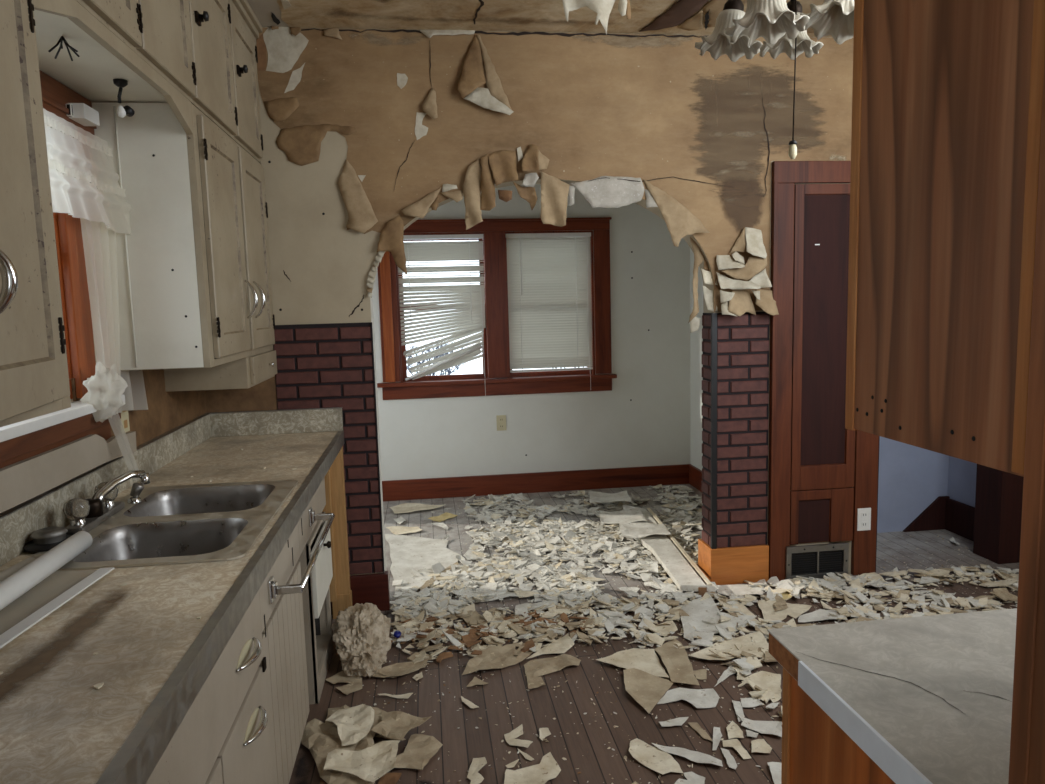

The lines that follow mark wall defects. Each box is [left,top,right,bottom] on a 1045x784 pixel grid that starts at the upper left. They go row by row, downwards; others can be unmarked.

crack [473,0,707,38]
peeling [256,26,357,166]
crack [301,28,432,87]
flaking render [397,73,408,89]
peeling [415,88,438,140]
peeling [419,29,514,115]
damp [694,66,824,230]
peeling [337,144,570,297]
peeling [643,179,710,247]